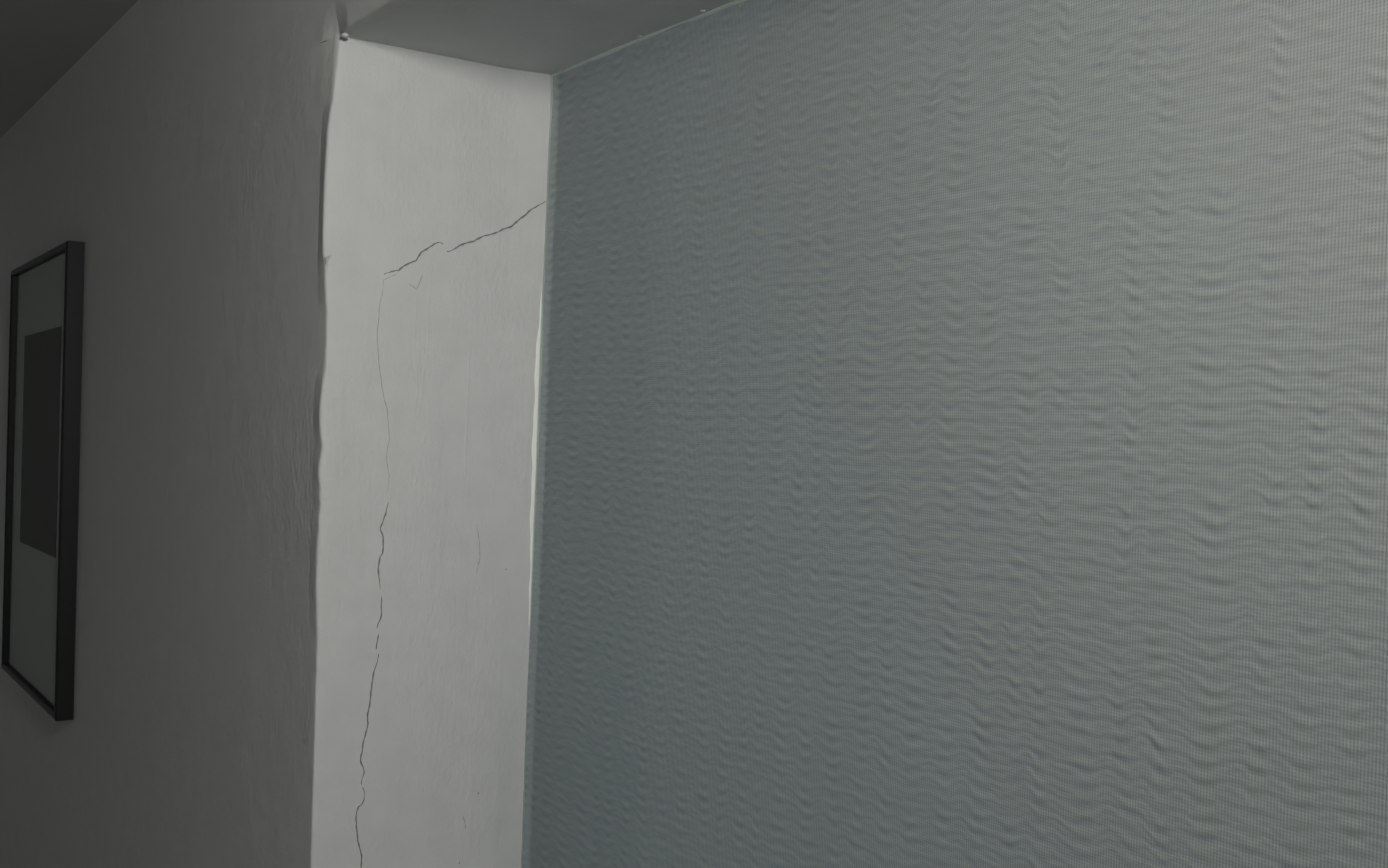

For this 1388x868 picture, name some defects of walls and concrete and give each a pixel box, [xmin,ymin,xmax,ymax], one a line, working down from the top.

crack [355,201,546,868]